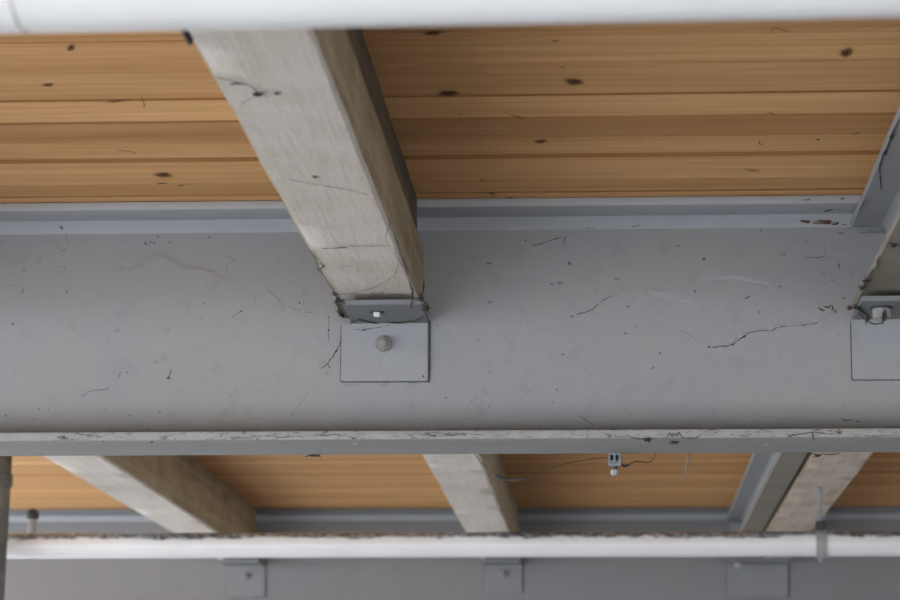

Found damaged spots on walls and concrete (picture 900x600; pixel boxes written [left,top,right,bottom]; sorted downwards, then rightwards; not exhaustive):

crack [708,322,817,348]